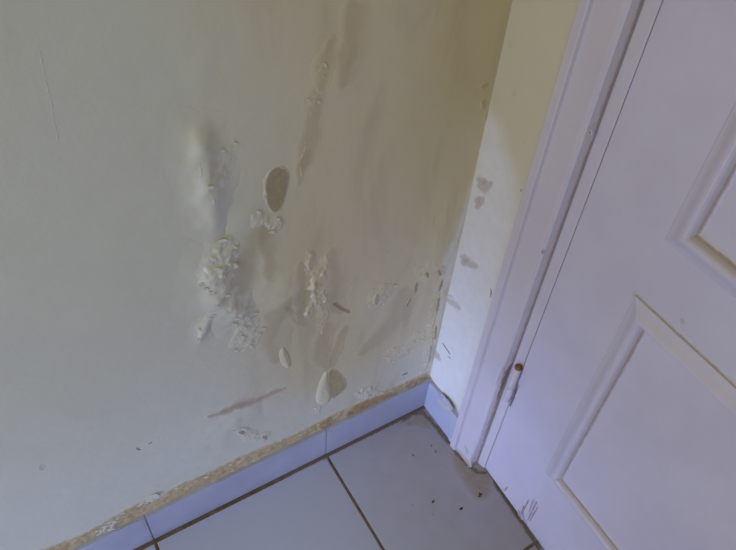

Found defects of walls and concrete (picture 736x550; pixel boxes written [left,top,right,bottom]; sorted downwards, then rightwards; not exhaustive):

leakage [289,0,377,188]
leakage [222,213,311,368]
peeling [262,165,290,214]
leakage [354,94,529,412]
rust [205,385,287,420]
flaking render [35,368,459,550]
leakage [480,380,507,442]